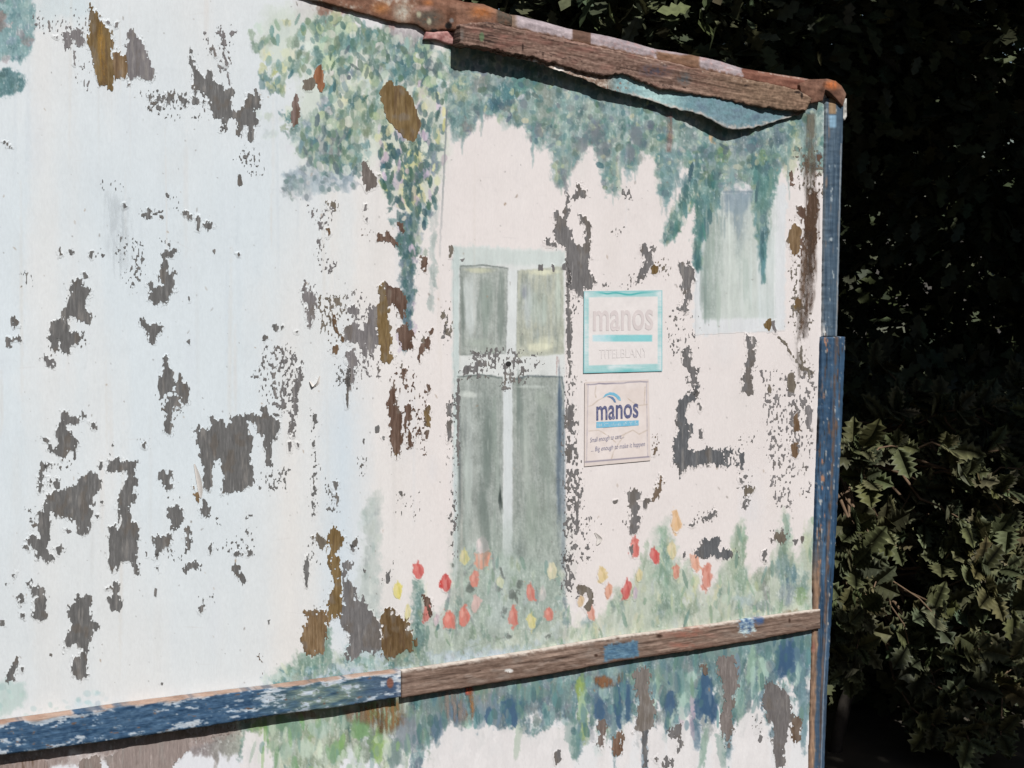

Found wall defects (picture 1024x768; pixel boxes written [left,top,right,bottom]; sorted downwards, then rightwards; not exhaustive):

peeling [33,2,265,186]
peeling [39,234,192,371]
peeling [538,179,609,614]
peeling [612,242,817,565]
peeling [22,279,545,684]
peeling [4,656,25,684]
peeling [0,755,52,768]
peeling [77,721,246,768]
peeling [699,654,740,749]
peeling [752,680,803,768]